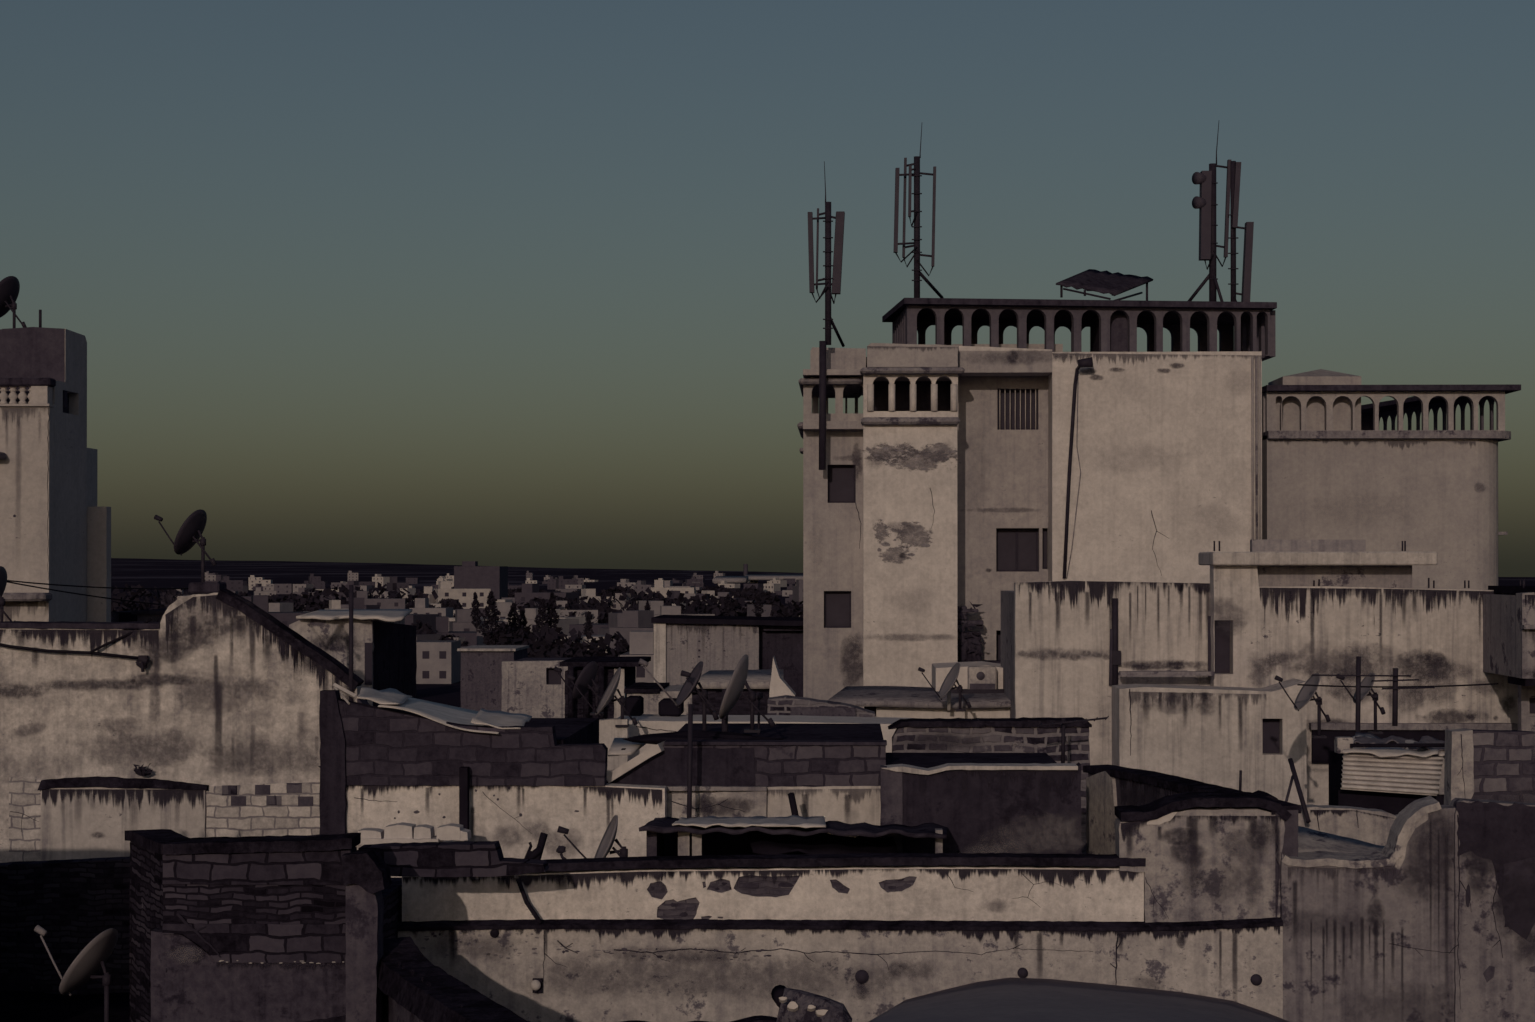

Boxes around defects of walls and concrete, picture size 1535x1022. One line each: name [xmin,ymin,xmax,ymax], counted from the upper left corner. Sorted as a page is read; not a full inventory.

peeling [863,442,958,472]
peeling [875,520,932,563]
water stain [1019,581,1210,618]
water stain [1260,588,1504,634]
water stain [0,595,349,701]
water stain [1127,661,1220,714]
spalling [647,875,800,920]
spalling [830,879,850,894]
spalling [879,876,917,893]
water stain [1415,819,1498,917]